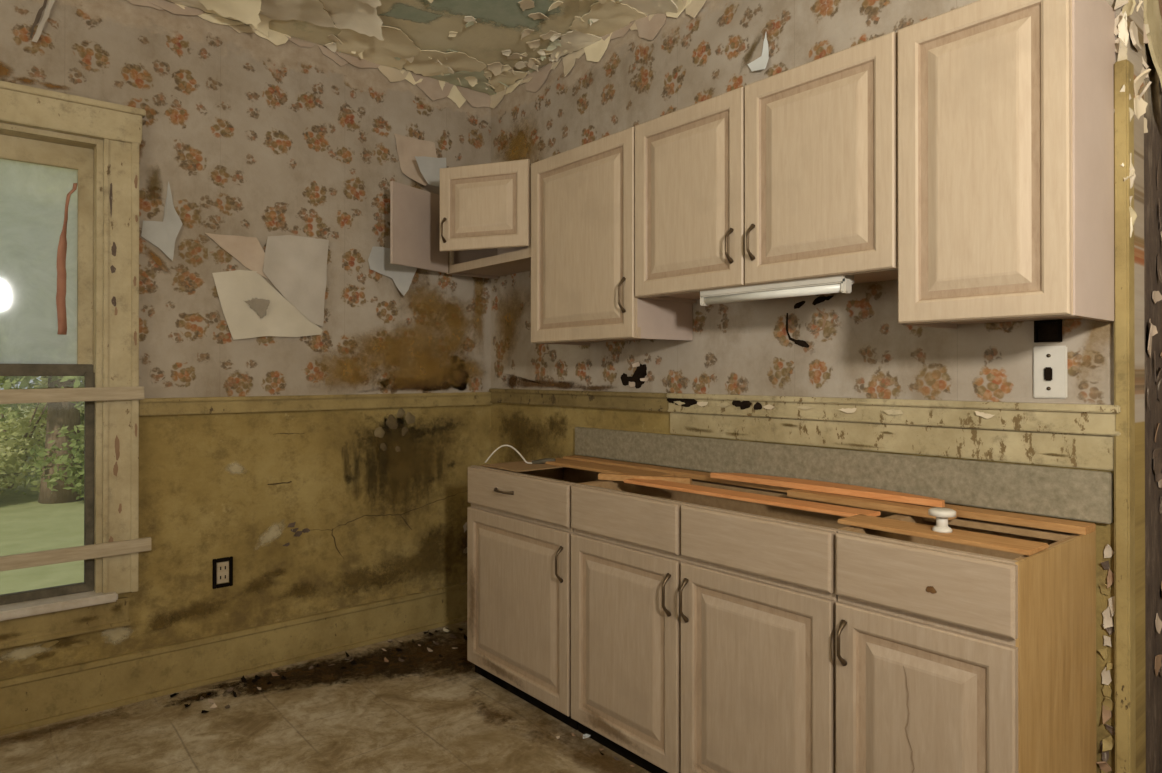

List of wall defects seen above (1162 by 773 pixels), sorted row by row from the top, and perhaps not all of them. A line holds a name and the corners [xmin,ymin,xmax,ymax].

peeling [145,0,706,109]
spalling [1114,0,1162,133]
spalling [1120,153,1137,238]
peeling [1152,161,1162,304]
water stain [323,282,483,390]
spalling [621,362,648,389]
peeling [667,398,774,410]
peeling [1147,319,1162,410]
water stain [363,422,455,503]